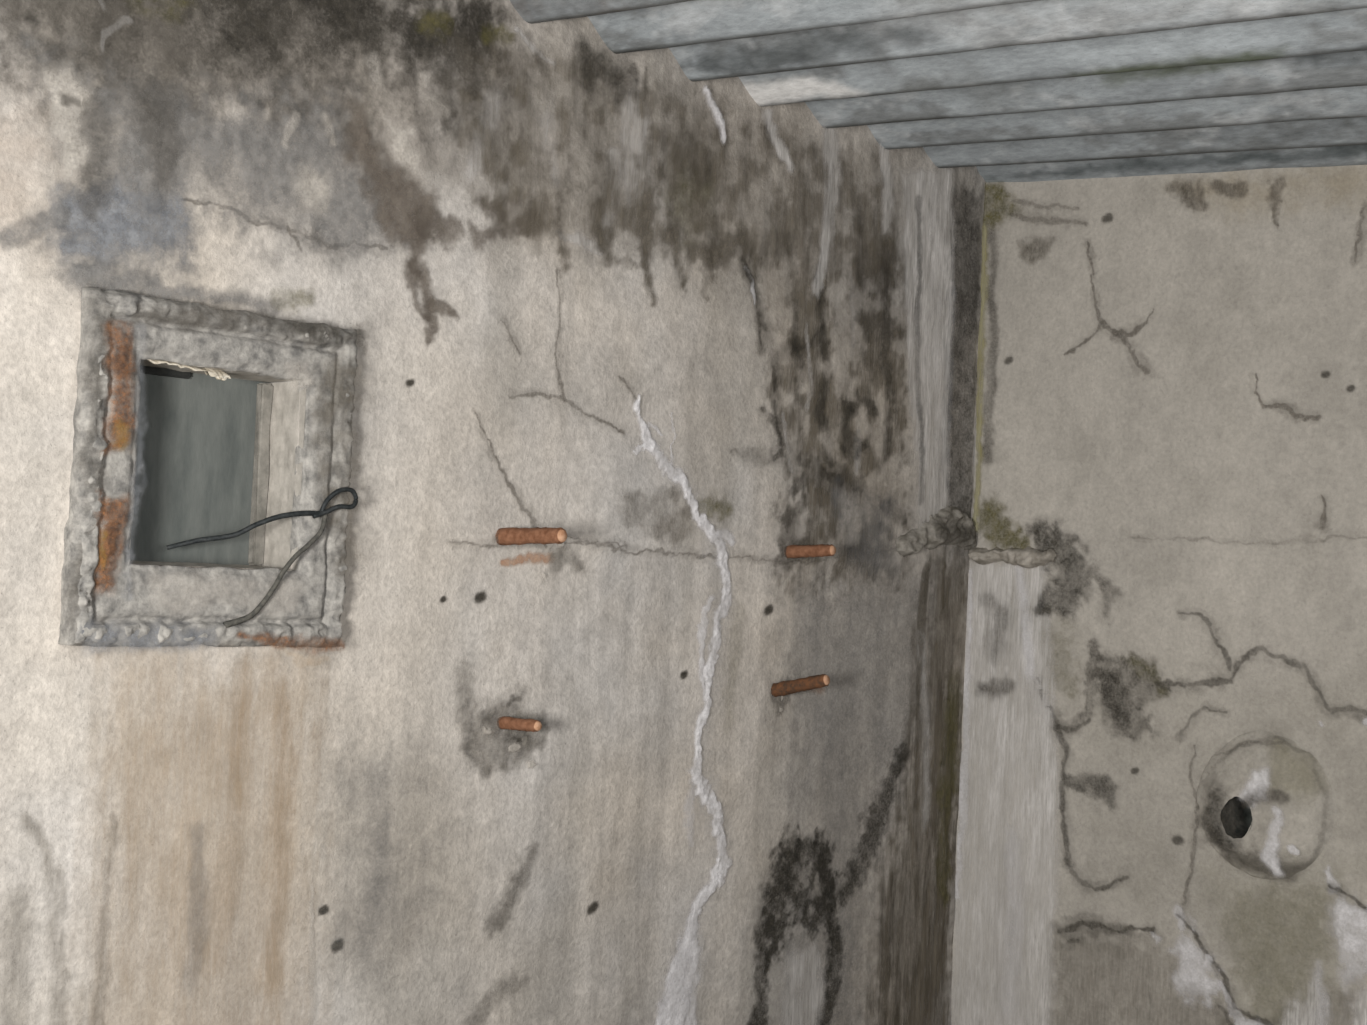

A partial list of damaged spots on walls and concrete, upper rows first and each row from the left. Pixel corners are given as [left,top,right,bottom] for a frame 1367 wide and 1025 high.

crack [1064,242,1149,373]
rust [107,324,135,450]
crack [1255,374,1320,421]
rust [96,498,127,590]
crack [475,412,576,547]
water stain [3,0,1083,1025]
water stain [1087,641,1153,739]
crack [1046,706,1071,847]
crack [1063,879,1154,933]
water stain [1174,908,1263,1025]
crack [1183,807,1268,1022]
water stain [1334,902,1367,969]